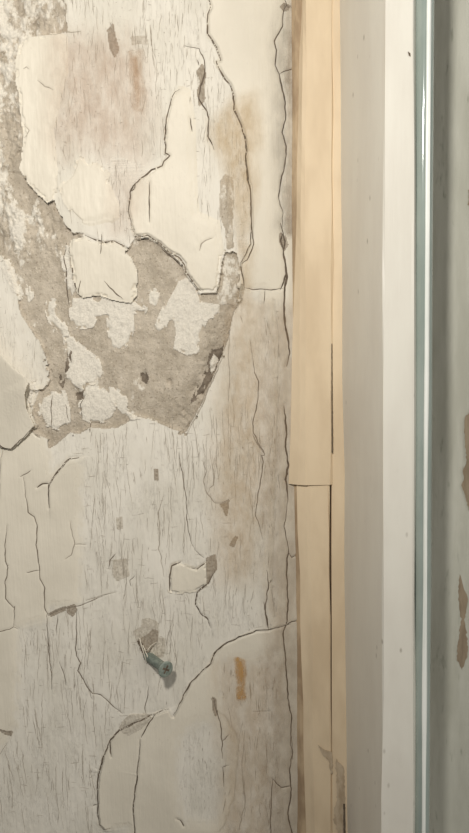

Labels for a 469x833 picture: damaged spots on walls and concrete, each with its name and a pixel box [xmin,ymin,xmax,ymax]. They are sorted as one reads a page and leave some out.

crack [63,90,212,302]
crack [177,0,292,364]
crack [0,396,102,471]
peeling [0,0,290,833]
crack [186,316,243,435]
crack [250,342,265,539]
peeling [461,413,469,510]
crack [0,408,295,833]
peeling [457,576,468,669]